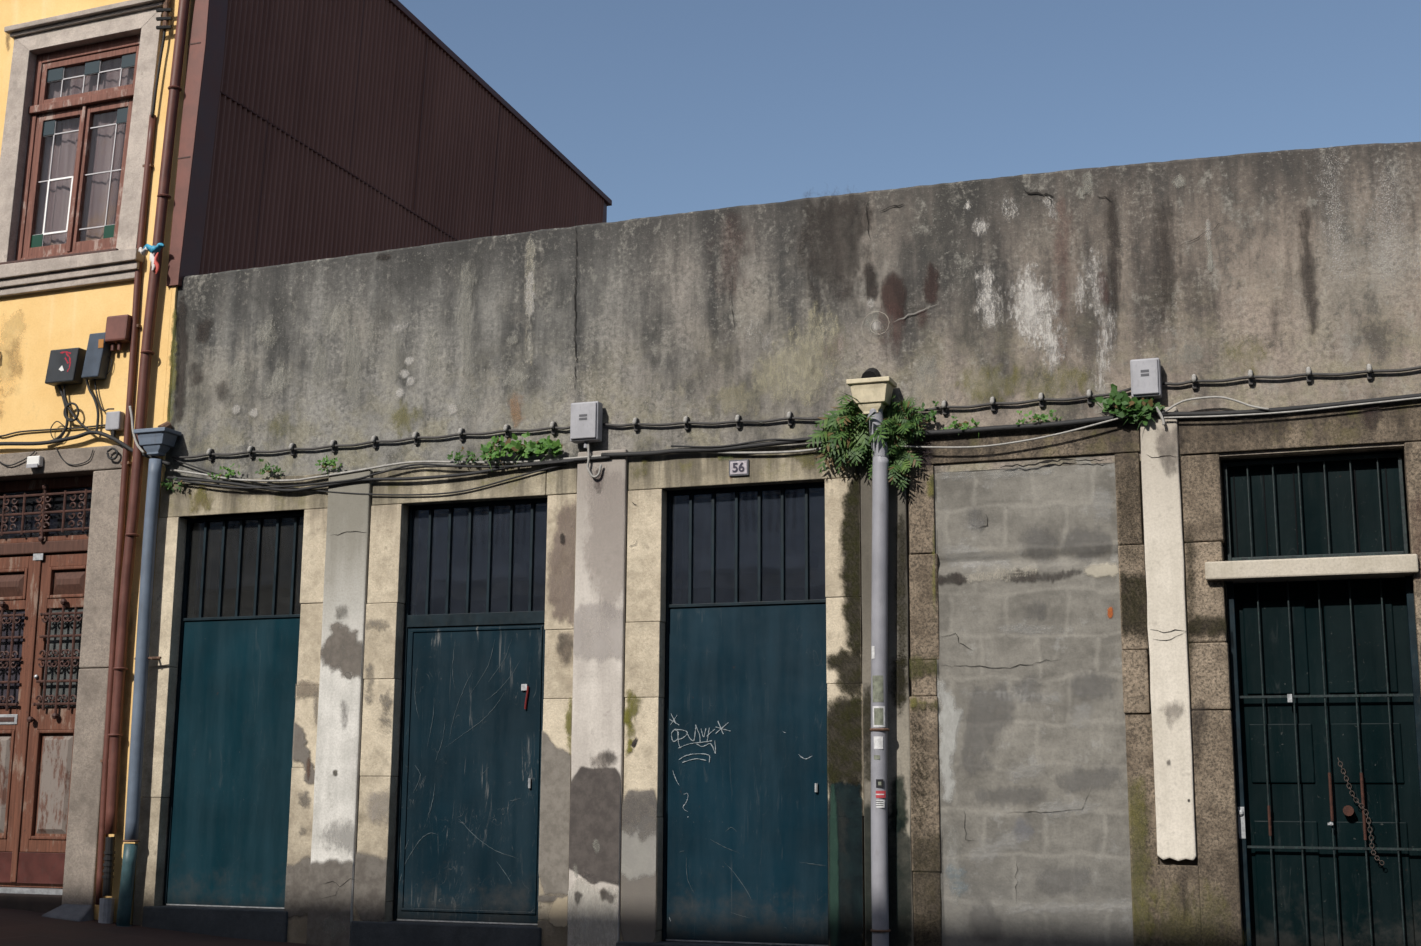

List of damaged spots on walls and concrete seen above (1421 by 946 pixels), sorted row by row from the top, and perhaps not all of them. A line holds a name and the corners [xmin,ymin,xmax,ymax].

water stain [799,198,906,341]
water stain [924,263,938,303]
water stain [1106,202,1119,344]
water stain [1299,211,1317,328]
water stain [840,473,861,654]
peeling [320,620,392,727]
peeling [538,731,657,946]